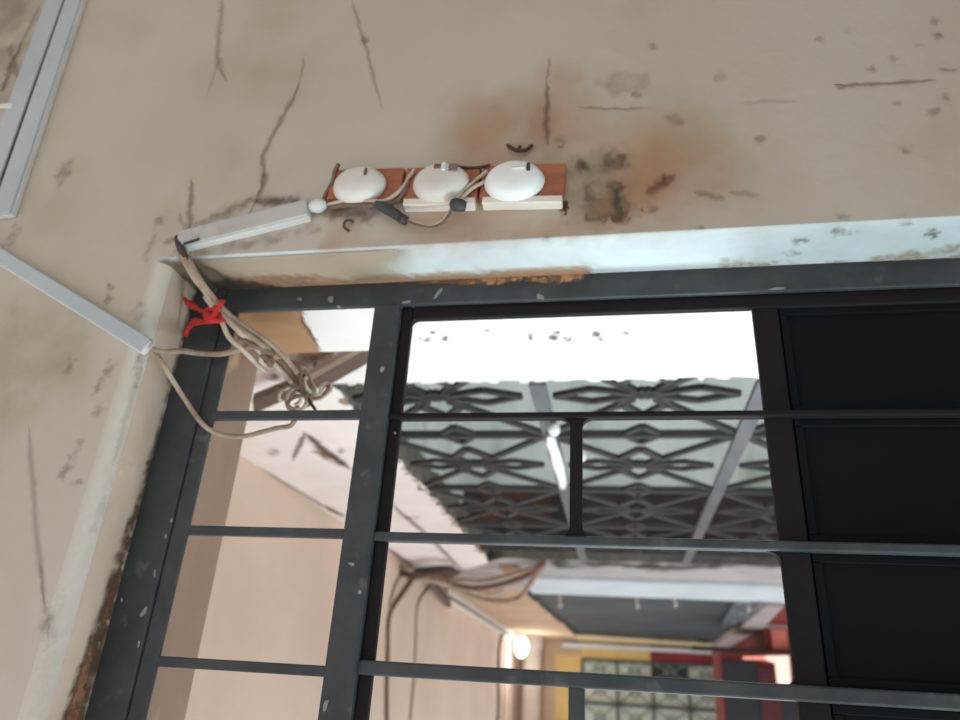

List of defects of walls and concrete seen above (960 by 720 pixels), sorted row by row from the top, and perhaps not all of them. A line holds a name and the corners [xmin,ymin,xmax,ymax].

peeling [873,253,924,262]
peeling [228,267,589,354]
flaking render [63,416,163,720]